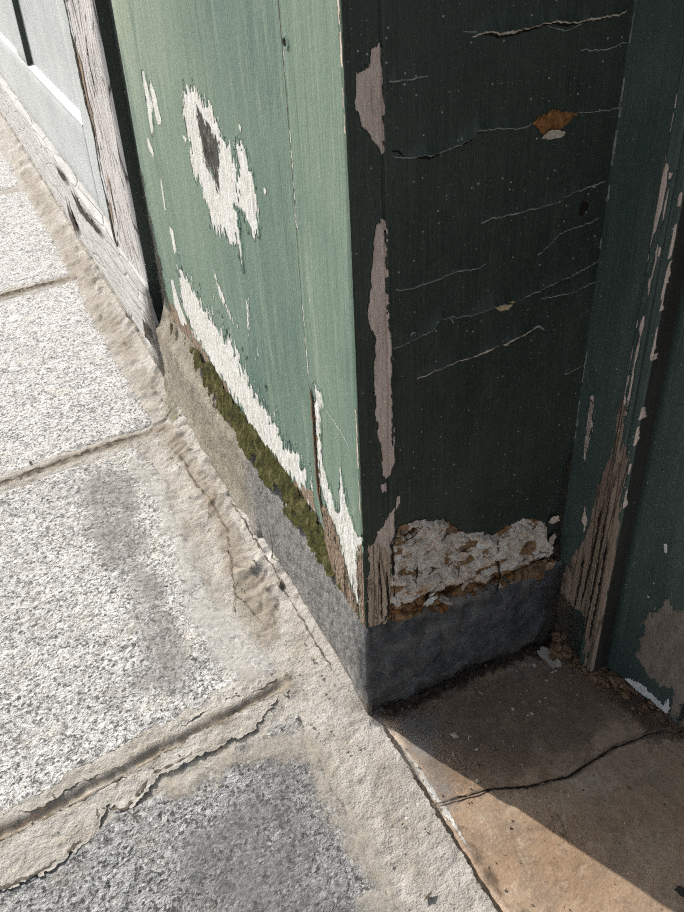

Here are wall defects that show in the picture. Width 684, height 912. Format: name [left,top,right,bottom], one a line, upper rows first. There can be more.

peeling [337,0,388,158]
crack [464,0,628,39]
peeling [169,0,364,605]
peeling [364,215,397,493]
crack [393,252,599,379]
peeling [619,313,658,446]
peeling [644,157,683,311]
peeling [375,496,400,576]
crack [206,688,285,729]
peeling [624,596,684,725]
crack [0,741,191,890]
crack [381,722,669,912]